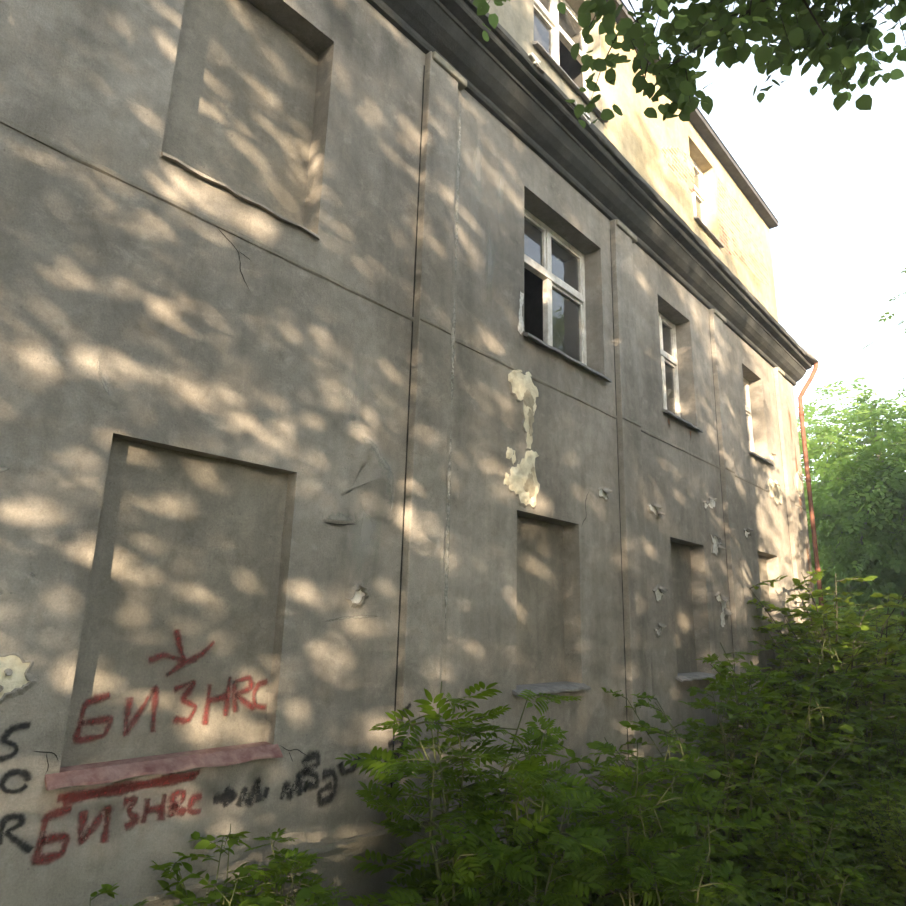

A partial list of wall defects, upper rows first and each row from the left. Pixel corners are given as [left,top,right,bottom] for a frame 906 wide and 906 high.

crack [219,230,250,289]
peeling [503,369,540,509]
peeling [703,497,717,511]
peeling [766,477,783,506]
peeling [794,470,804,500]
peeling [345,581,371,609]
peeling [0,652,37,704]